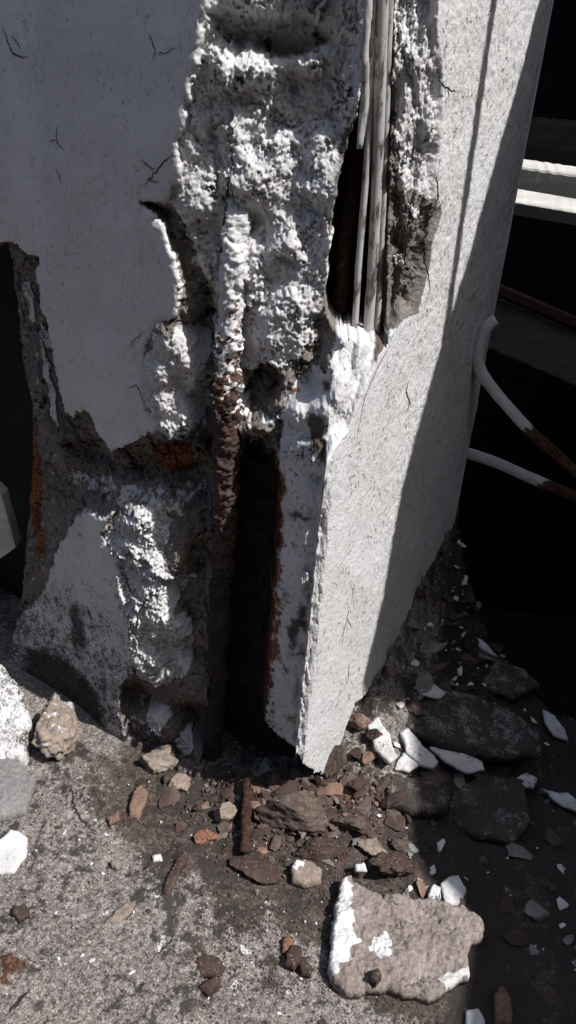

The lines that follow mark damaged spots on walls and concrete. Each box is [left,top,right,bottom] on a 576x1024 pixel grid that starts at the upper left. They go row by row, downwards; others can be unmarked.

crack [1,25,27,58]
crack [141,155,172,187]
spalling [381,0,445,338]
spalling [0,0,373,767]
rust [29,422,47,559]
spalling [417,683,446,700]